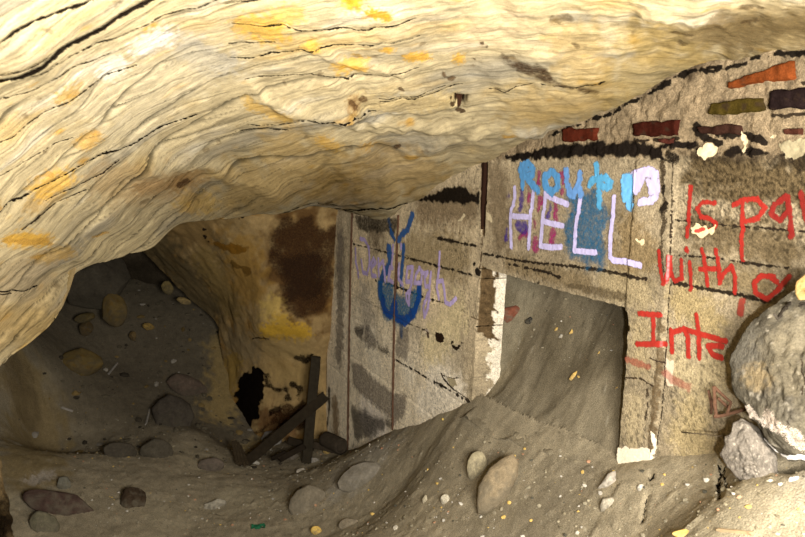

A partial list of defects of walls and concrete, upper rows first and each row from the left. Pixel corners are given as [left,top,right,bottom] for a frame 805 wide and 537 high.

damp [354,325,408,357]
damp [351,364,406,448]